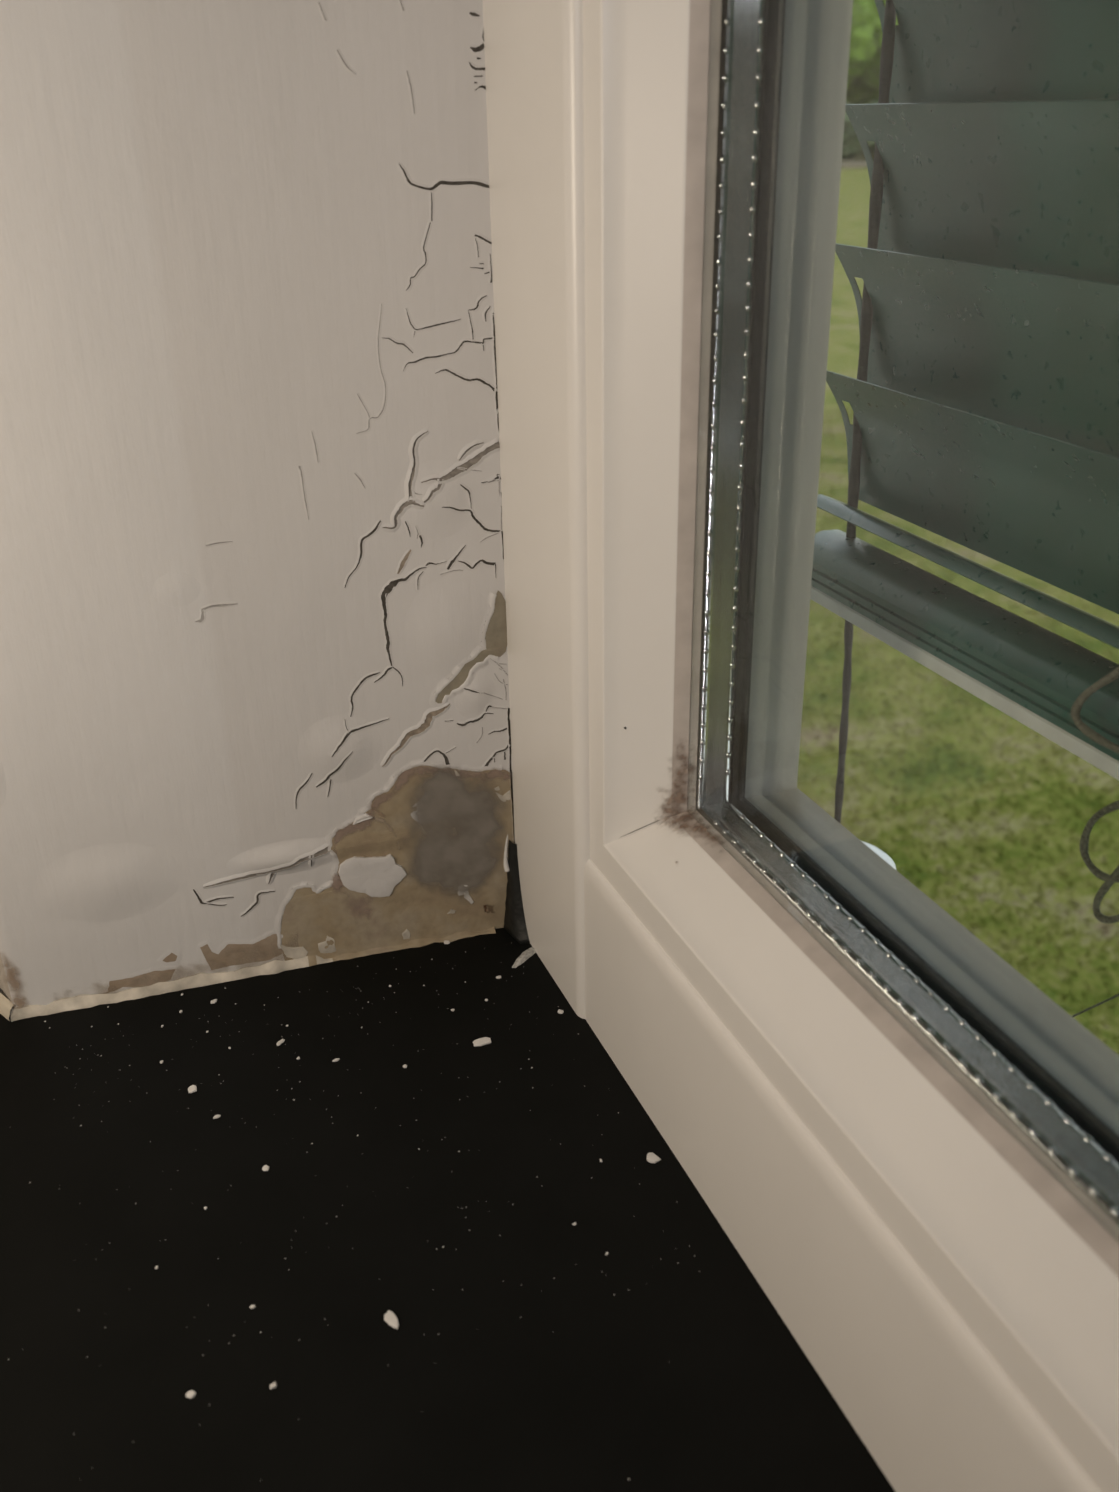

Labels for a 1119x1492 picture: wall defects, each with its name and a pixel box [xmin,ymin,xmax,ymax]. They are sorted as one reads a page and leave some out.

crack [316,2,357,76]
crack [405,70,417,114]
crack [467,10,486,93]
crack [293,163,515,844]
water stain [412,771,502,893]
crack [191,844,333,917]
peeling [87,759,514,995]